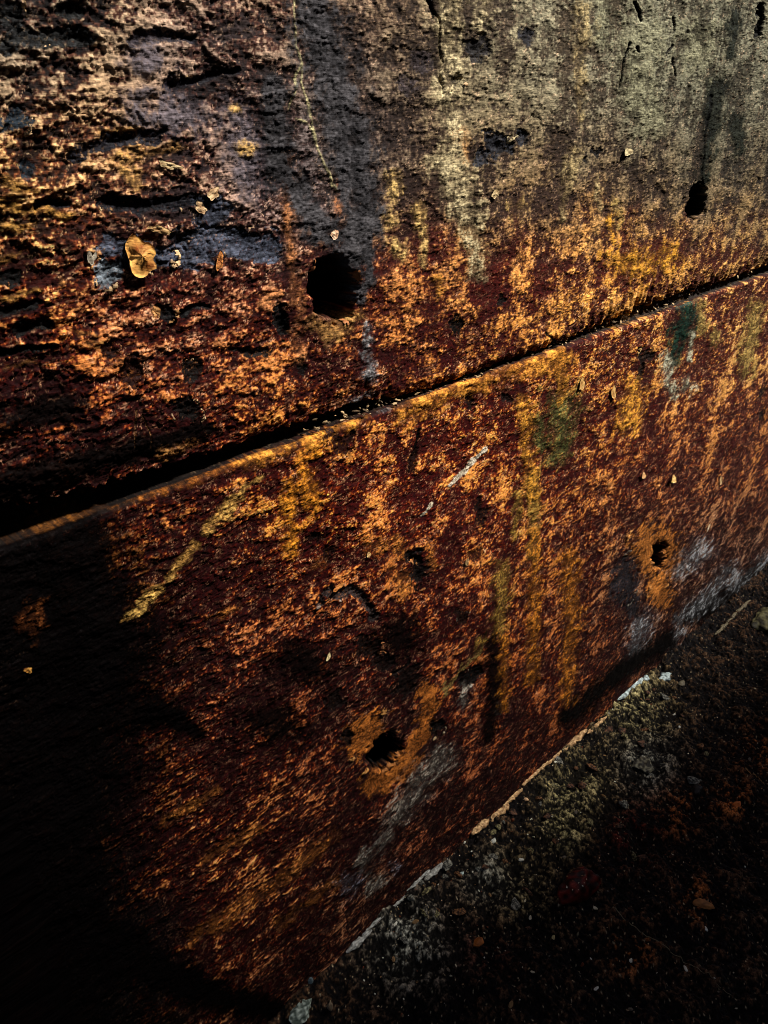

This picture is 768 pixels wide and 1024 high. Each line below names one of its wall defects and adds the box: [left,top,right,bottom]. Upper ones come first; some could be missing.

rust [260,202,363,342]
rust [188,420,359,557]
rust [292,332,308,363]
rust [394,347,577,430]
rust [516,398,540,502]
rust [613,375,650,437]
spalling [316,582,447,799]
rust [364,534,405,561]
spalling [456,663,484,692]
rust [523,527,546,685]
rust [554,547,587,706]
spalling [606,512,689,624]